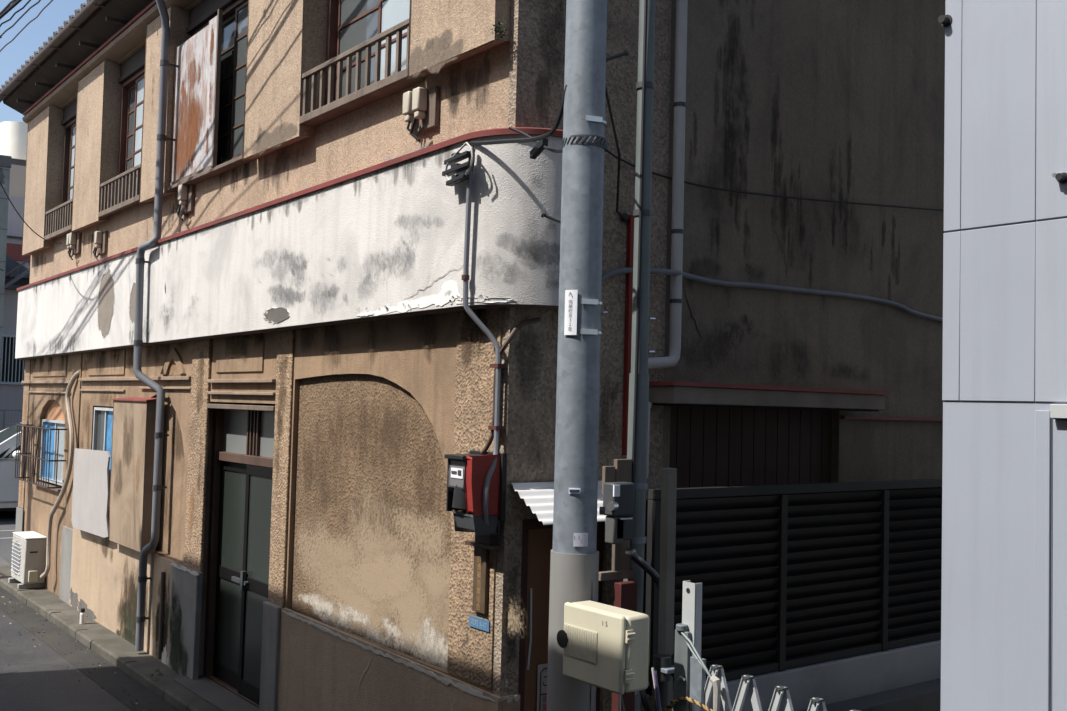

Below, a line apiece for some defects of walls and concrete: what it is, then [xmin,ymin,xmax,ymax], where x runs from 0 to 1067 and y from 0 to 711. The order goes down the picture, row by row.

corrosion [175,28,214,179]
damp [462,309,481,360]
damp [117,567,188,677]